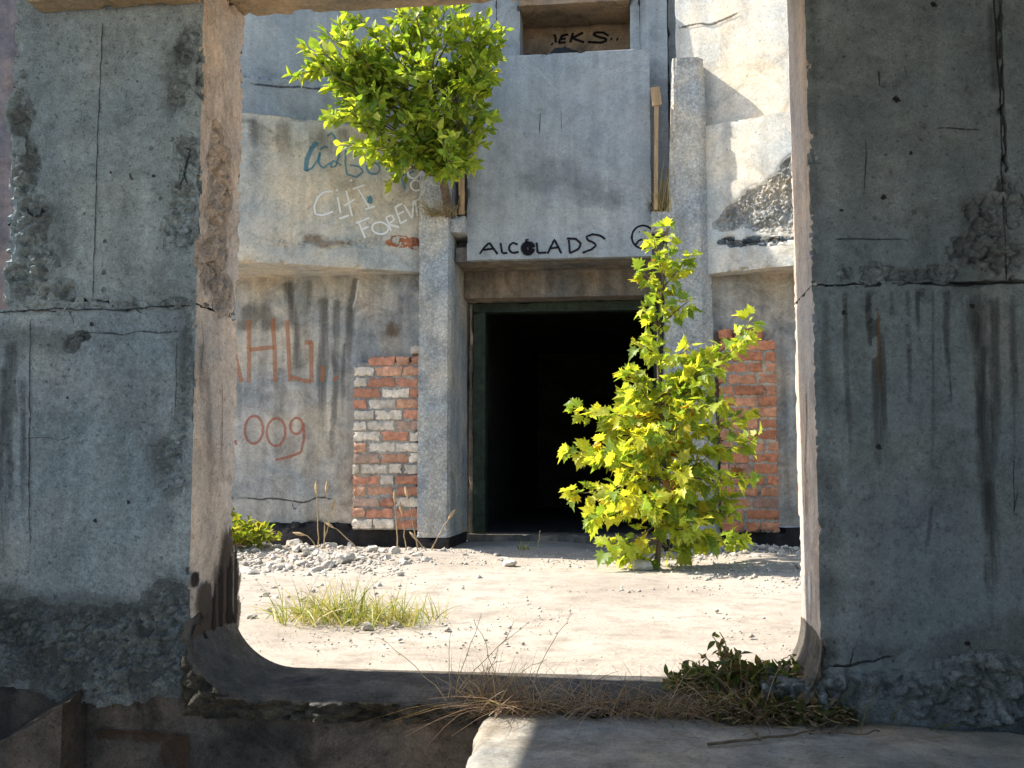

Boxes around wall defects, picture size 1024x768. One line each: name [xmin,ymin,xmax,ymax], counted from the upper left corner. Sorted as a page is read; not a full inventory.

crack [0,23,204,542]
spalling [2,68,234,501]
spalling [712,154,794,248]
crack [825,0,1024,288]
spalling [836,170,1024,286]
spalling [0,527,241,708]
spalling [809,641,1024,730]